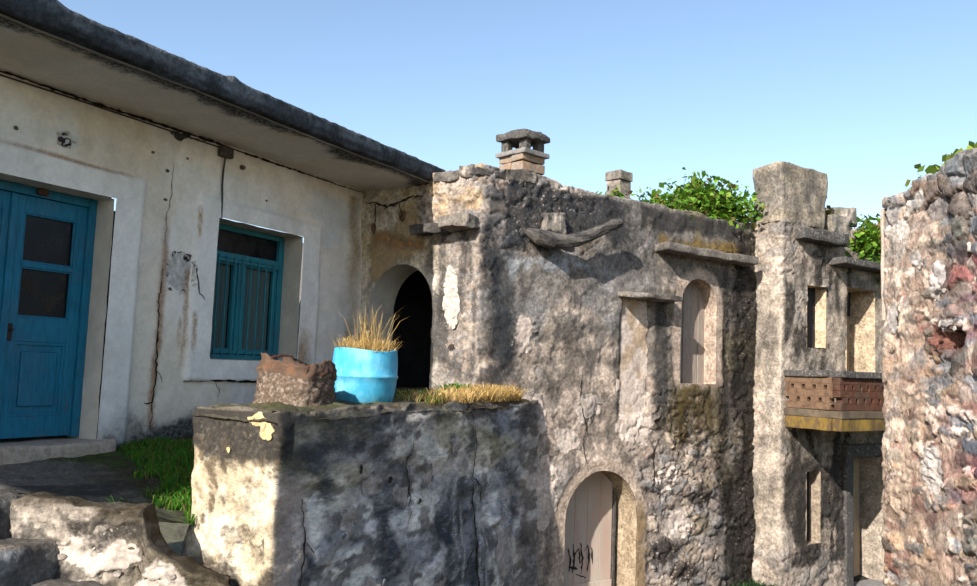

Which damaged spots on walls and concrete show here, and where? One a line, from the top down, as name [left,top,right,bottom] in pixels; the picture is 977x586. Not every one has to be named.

crack [0,70,423,226]
peeling [166,251,198,295]
crack [144,270,257,429]
peeling [247,412,274,441]